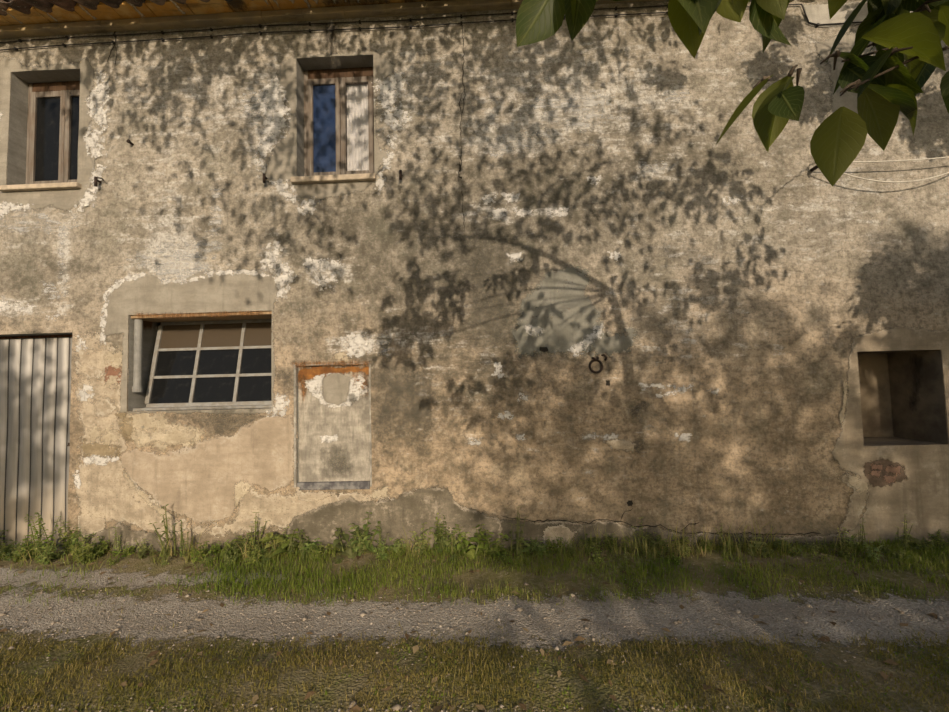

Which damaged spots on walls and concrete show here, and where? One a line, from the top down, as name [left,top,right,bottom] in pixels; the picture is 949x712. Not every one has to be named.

peeling [0,70,111,274]
peeling [243,76,317,215]
peeling [371,71,413,193]
crack [458,25,466,232]
peeling [480,192,532,219]
peeling [544,207,568,217]
spalling [71,241,390,538]
peeling [567,323,605,357]
spalling [838,459,907,533]